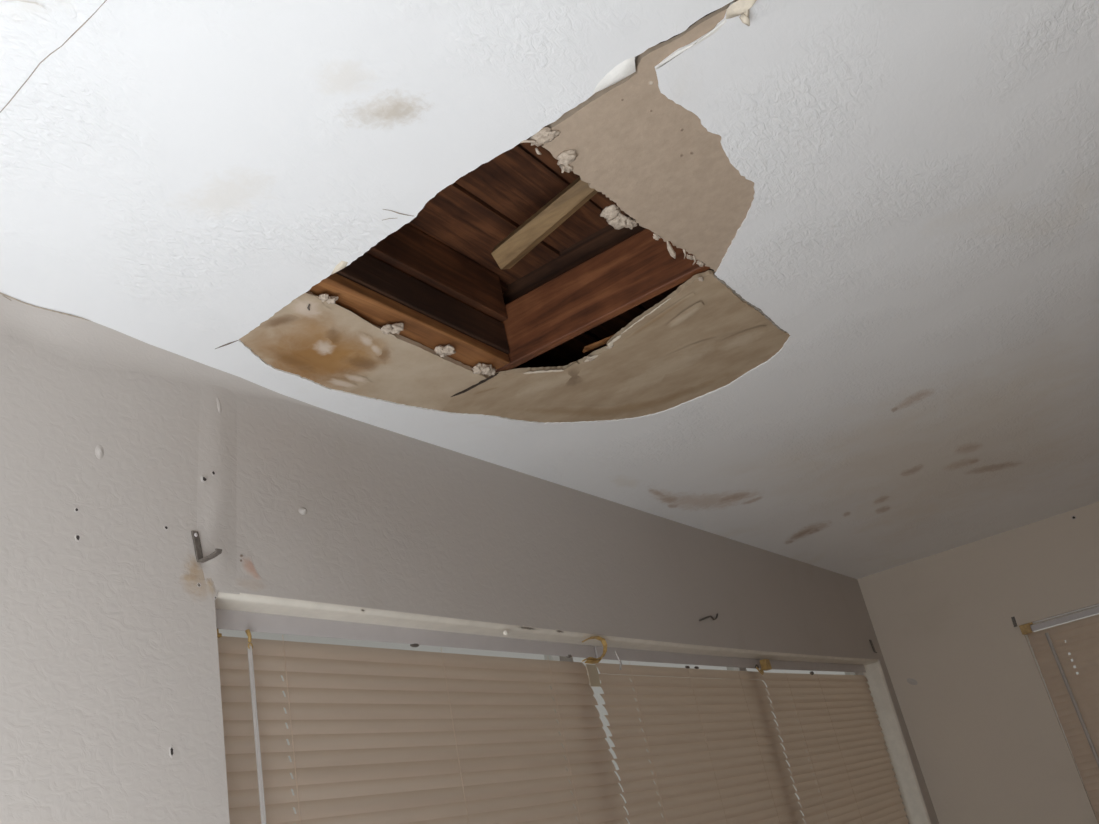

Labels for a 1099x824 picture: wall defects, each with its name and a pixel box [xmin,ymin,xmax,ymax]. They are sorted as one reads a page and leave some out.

crack [0,0,107,113]
leakage [300,47,451,136]
peeling [593,57,636,94]
peeling [655,0,757,70]
leakage [239,293,408,398]
leakage [640,282,1099,561]